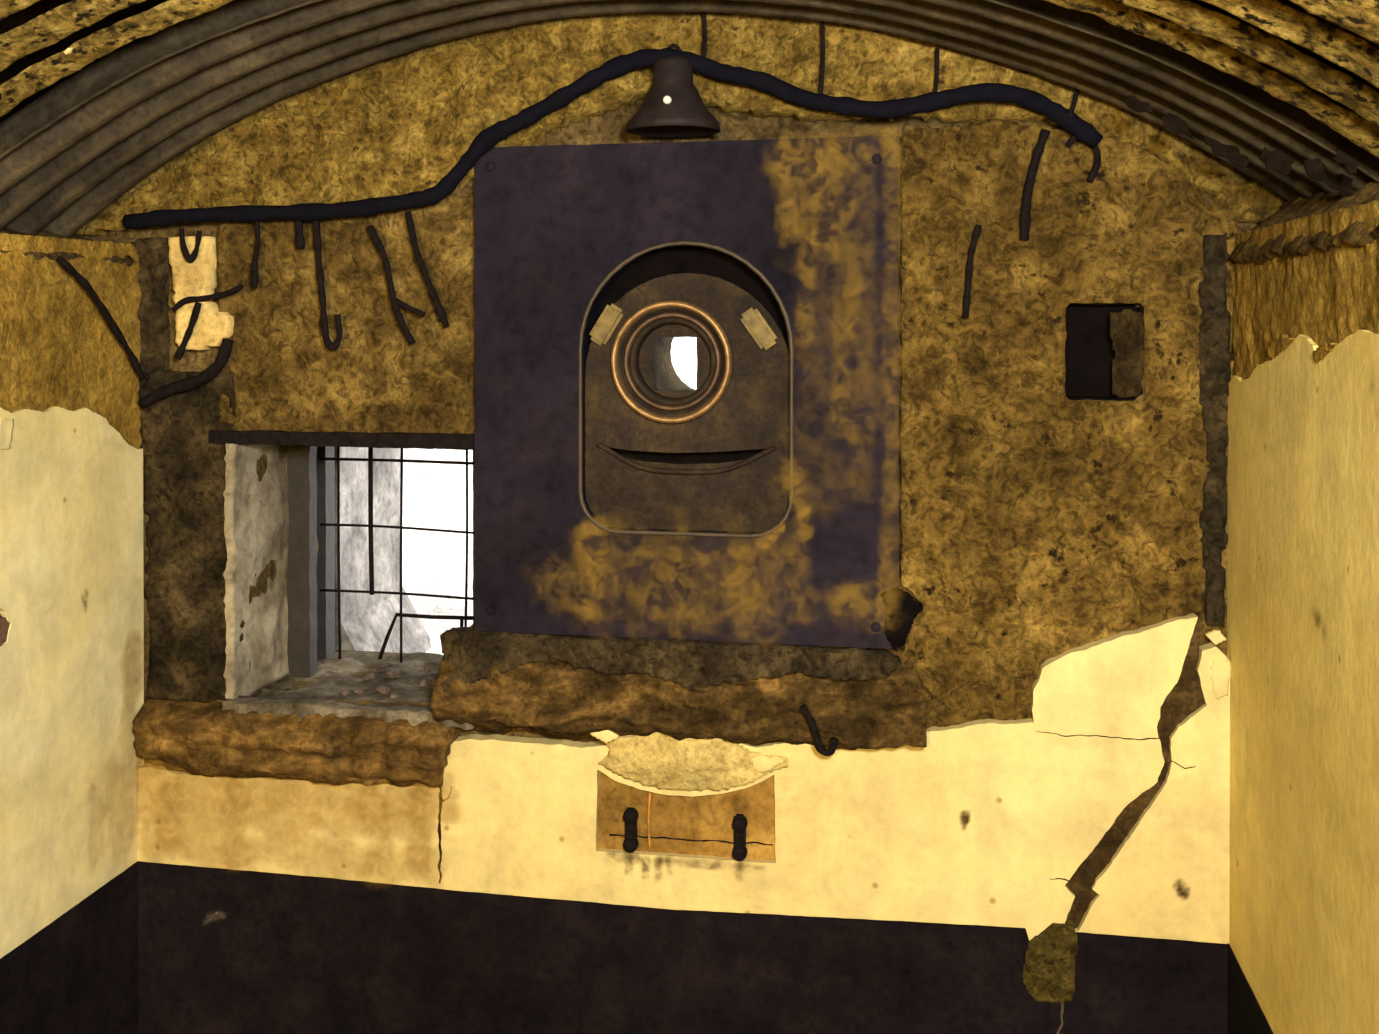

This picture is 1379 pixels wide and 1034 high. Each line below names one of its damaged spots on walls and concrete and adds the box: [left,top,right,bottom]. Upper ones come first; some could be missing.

spalling [0,196,475,703]
spalling [430,95,1379,756]
crack [1037,232,1231,928]